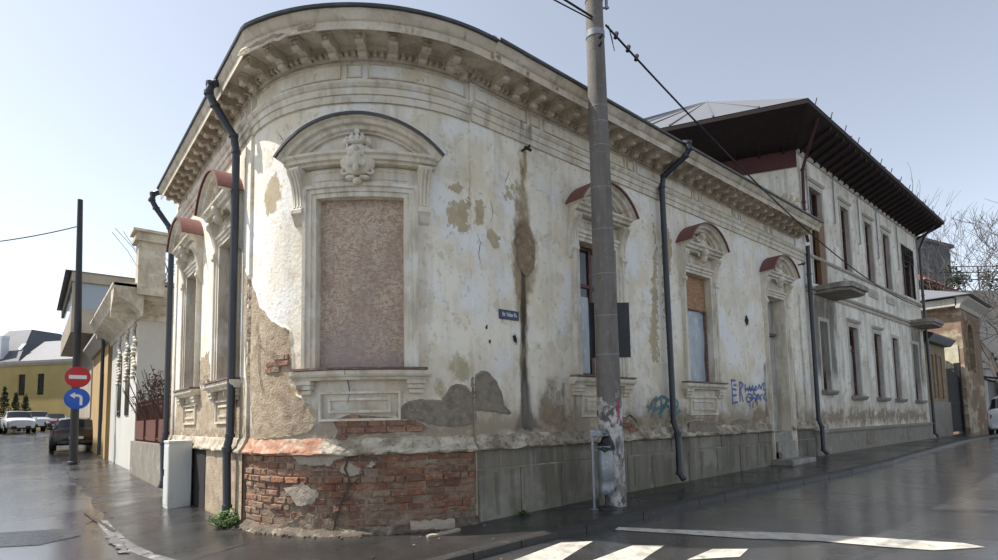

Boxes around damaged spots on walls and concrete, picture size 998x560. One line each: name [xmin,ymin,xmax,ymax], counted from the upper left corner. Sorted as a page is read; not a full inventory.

peeling [264,172,282,216]
peeling [446,182,501,249]
peeling [175,269,511,441]
leakage [518,272,567,430]